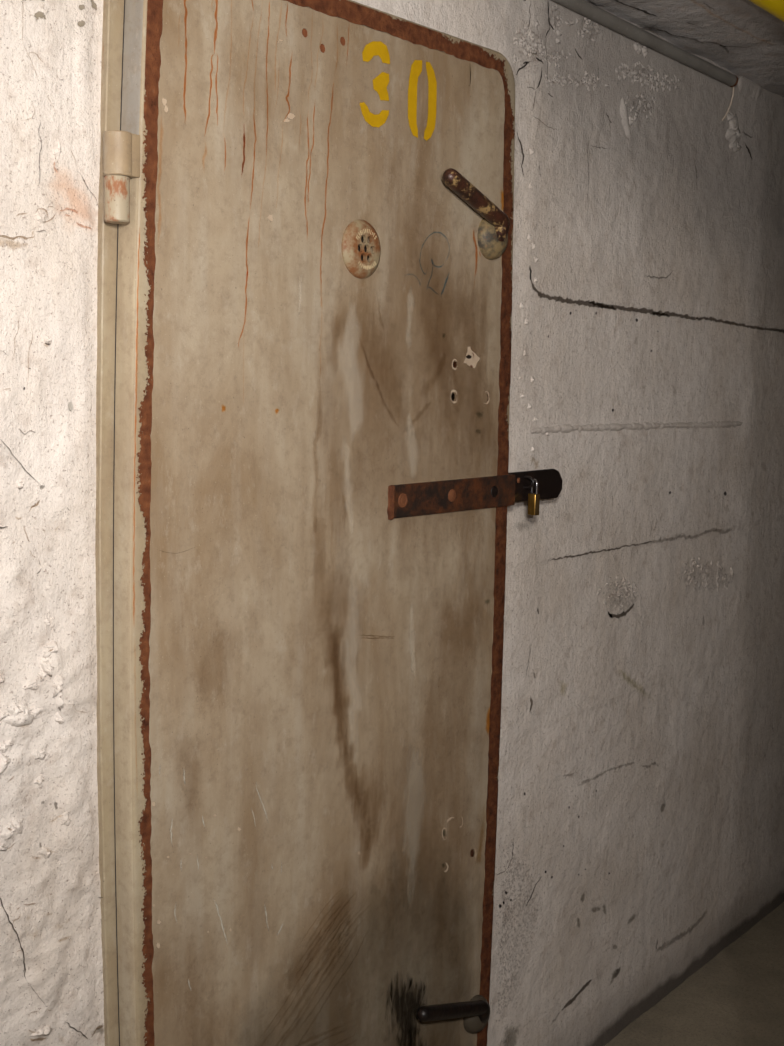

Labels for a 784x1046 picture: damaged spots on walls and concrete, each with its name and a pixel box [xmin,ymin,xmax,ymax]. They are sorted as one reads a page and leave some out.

crack [615,0,656,16]
crack [516,0,554,97]
corrosion [284,0,515,476]
crack [529,268,784,333]
corrosion [136,0,163,1046]
crack [550,541,652,561]
corrosion [479,506,507,1003]
crack [0,898,26,976]
corrosion [477,1022,488,1046]